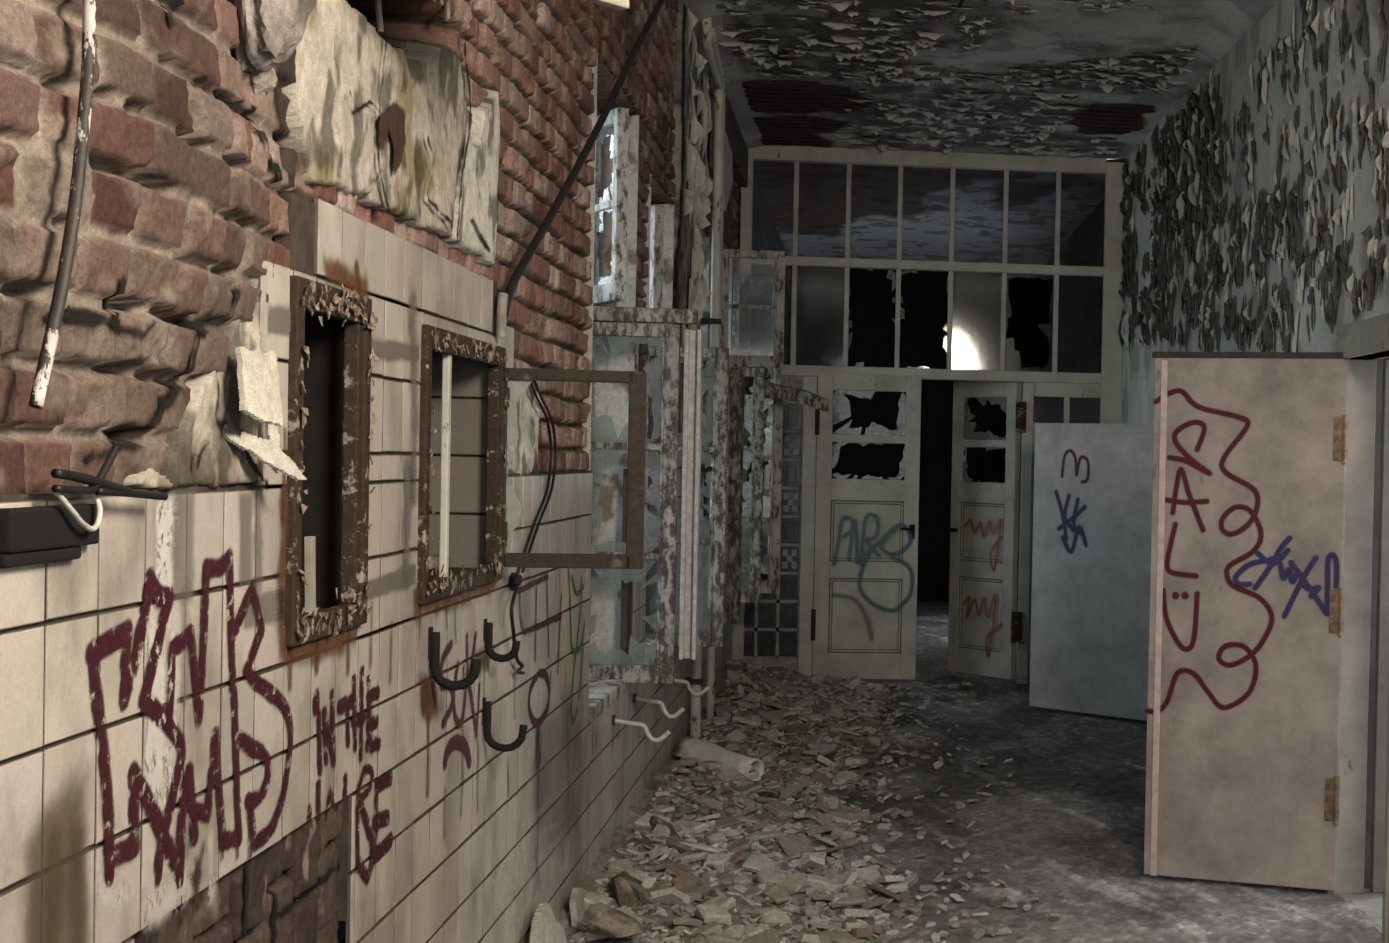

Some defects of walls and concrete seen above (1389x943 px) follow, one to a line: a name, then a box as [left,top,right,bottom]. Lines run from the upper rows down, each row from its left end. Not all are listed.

peeling [123,277,307,490]
corrosion [325,261,368,297]
peeling [272,0,500,268]
peeling [508,381,542,476]
peeling [666,0,1389,467]
corrosion [278,474,357,690]
peeling [131,799,344,943]